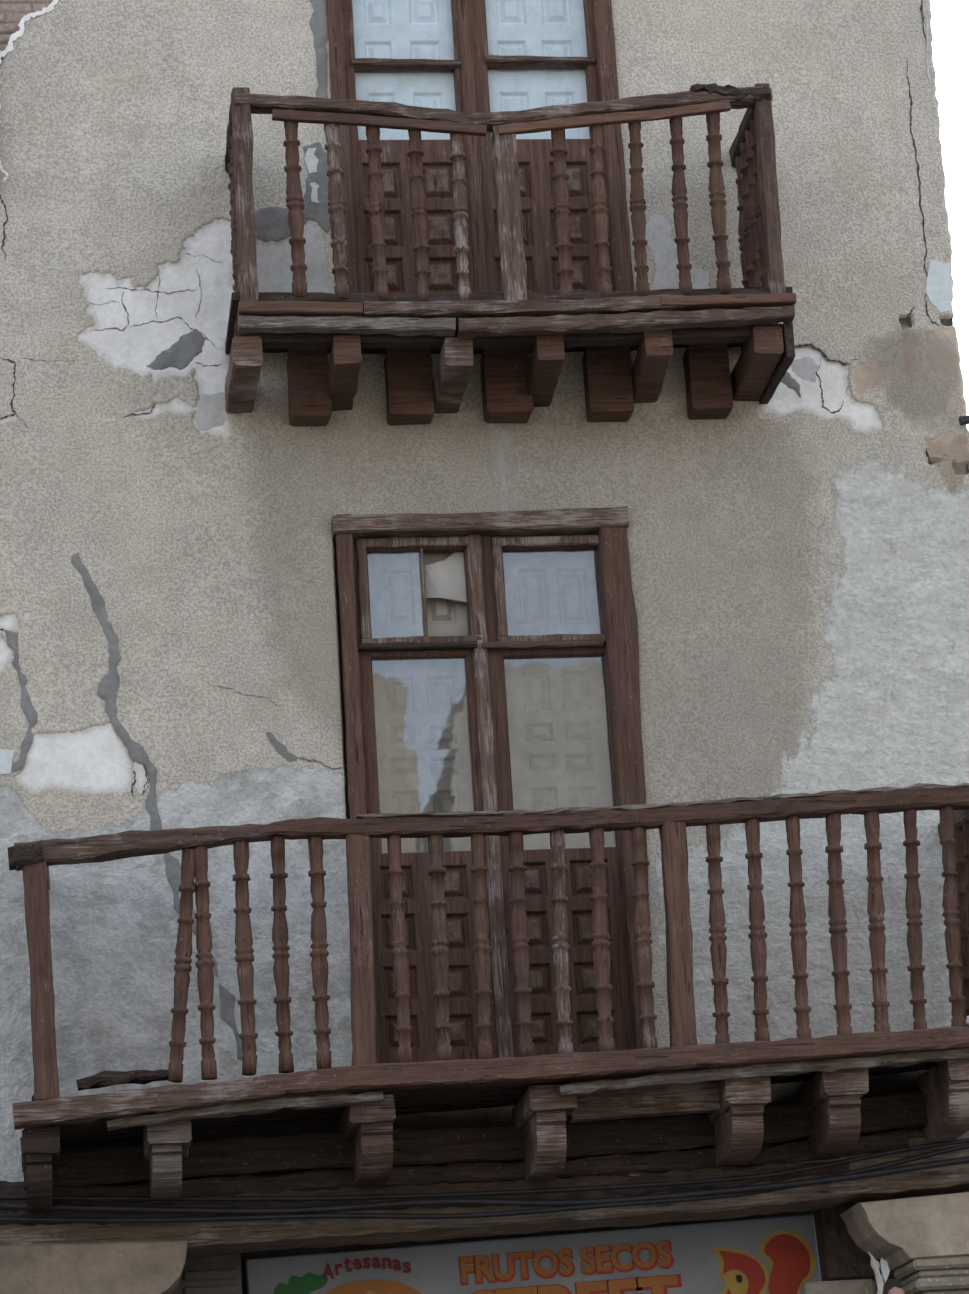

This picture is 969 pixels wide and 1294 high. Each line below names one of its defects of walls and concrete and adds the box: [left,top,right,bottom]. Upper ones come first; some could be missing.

flaking render [0,0,58,64]
crack [795,0,947,366]
peeling [78,219,235,440]
crack [0,358,73,427]
peeling [763,347,882,431]
spalling [926,452,969,474]
peeling [0,612,30,671]
peeling [0,723,149,796]